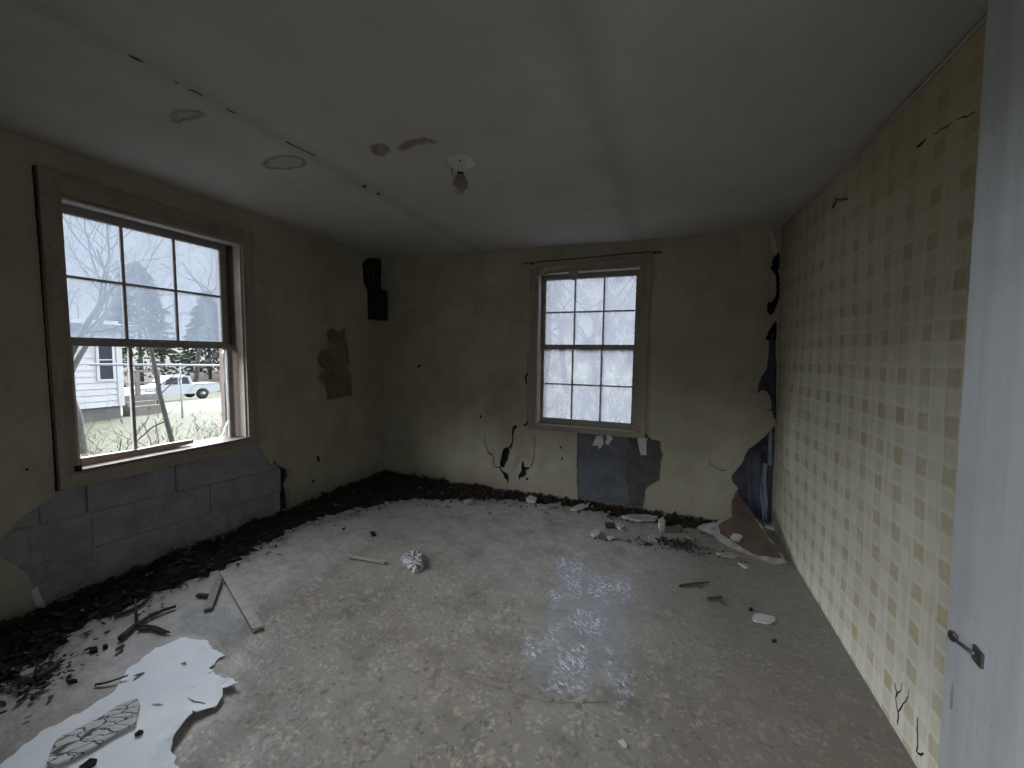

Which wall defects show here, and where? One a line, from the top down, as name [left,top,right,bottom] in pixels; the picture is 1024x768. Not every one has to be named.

flaking render [0,448,295,608]
crack [484,364,535,474]
flaking render [576,433,663,509]
flaking render [731,330,777,526]